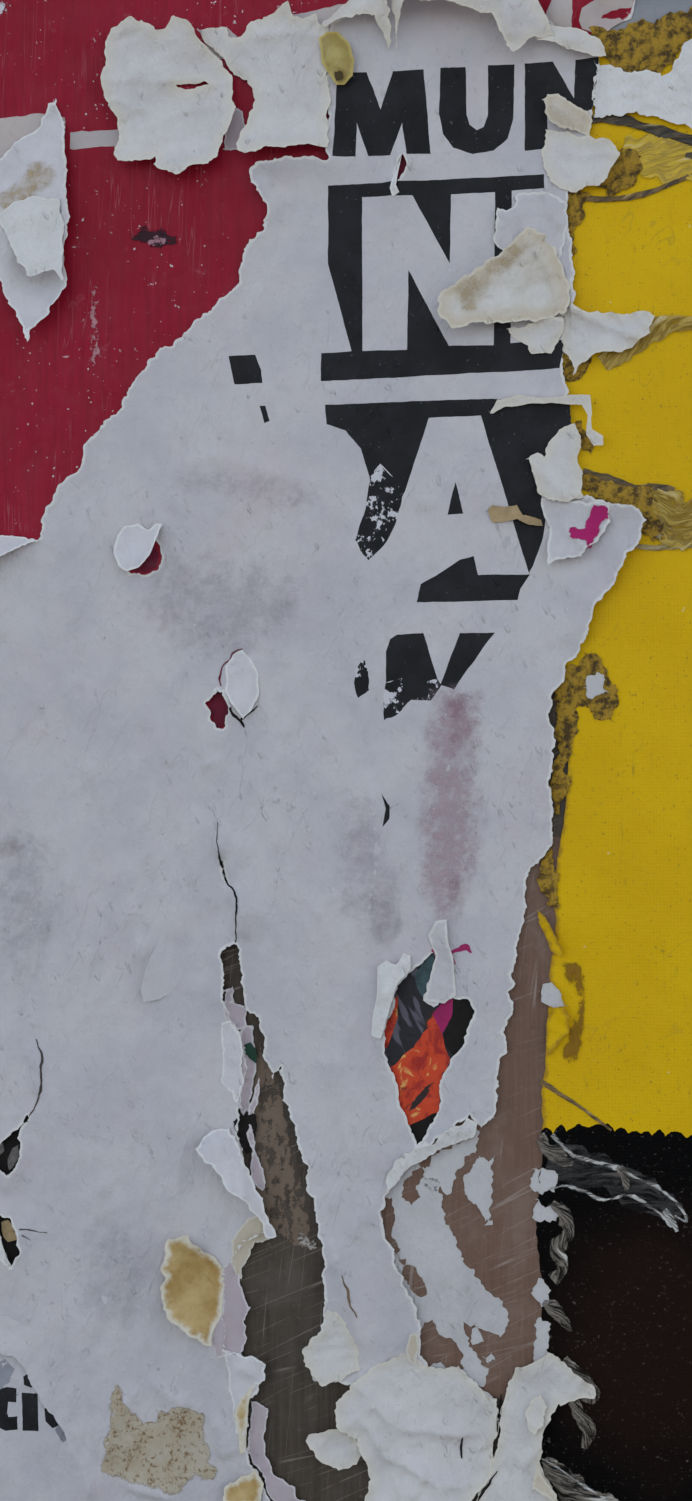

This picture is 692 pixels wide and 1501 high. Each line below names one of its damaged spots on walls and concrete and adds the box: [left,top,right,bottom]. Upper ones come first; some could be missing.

peeling [0,99,70,342]
peeling [100,0,692,375]
peeling [490,394,603,502]
peeling [114,523,162,571]
peeling [584,672,608,699]
crack [216,822,238,943]
peeling [371,953,411,1038]
peeling [425,919,456,1003]
peeling [541,982,571,1056]
crack [27,1039,44,1122]
peeling [160,1127,277,1454]
peeling [302,1310,596,1501]